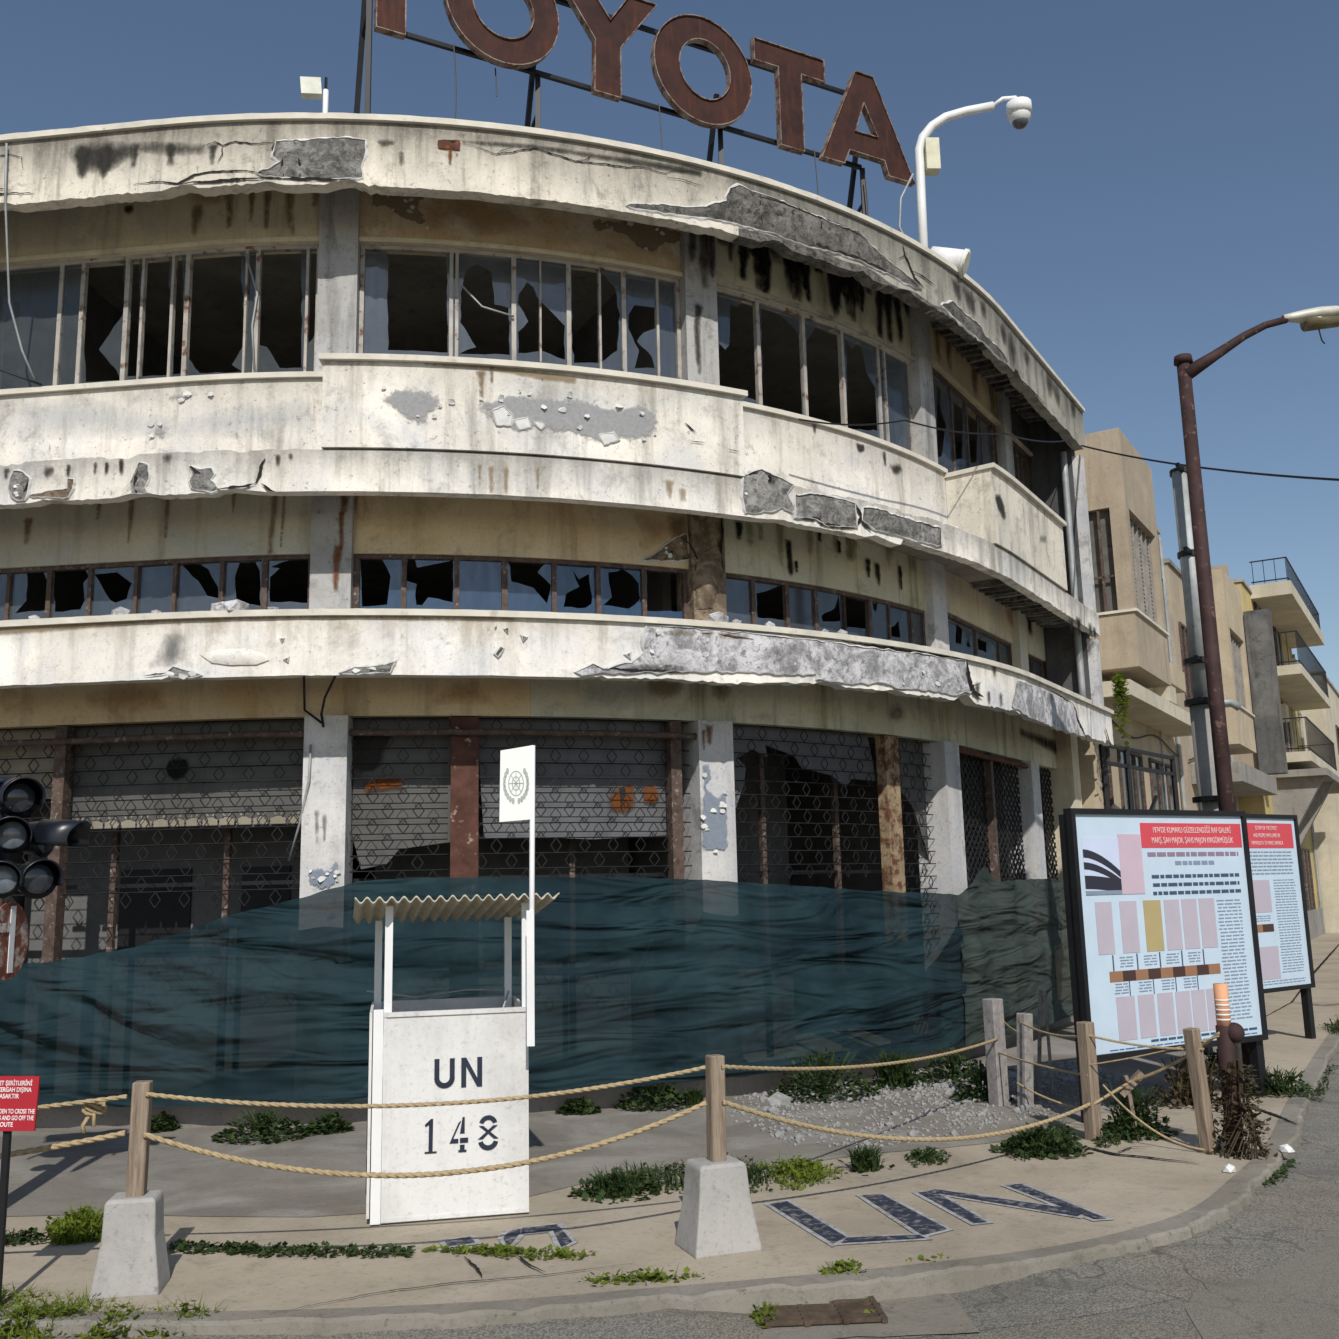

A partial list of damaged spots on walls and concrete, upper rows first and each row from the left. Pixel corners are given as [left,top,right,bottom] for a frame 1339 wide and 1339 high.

damp [74,143,218,176]
crack [133,141,275,185]
spalling [256,136,369,182]
peeling [372,193,429,230]
damp [690,233,909,343]
spalling [593,183,1045,423]
peeling [381,386,456,423]
peeling [479,389,657,446]
spalling [740,469,942,548]
corrosion [333,496,356,588]
spalling [574,624,972,697]
peeling [1012,681,1085,737]